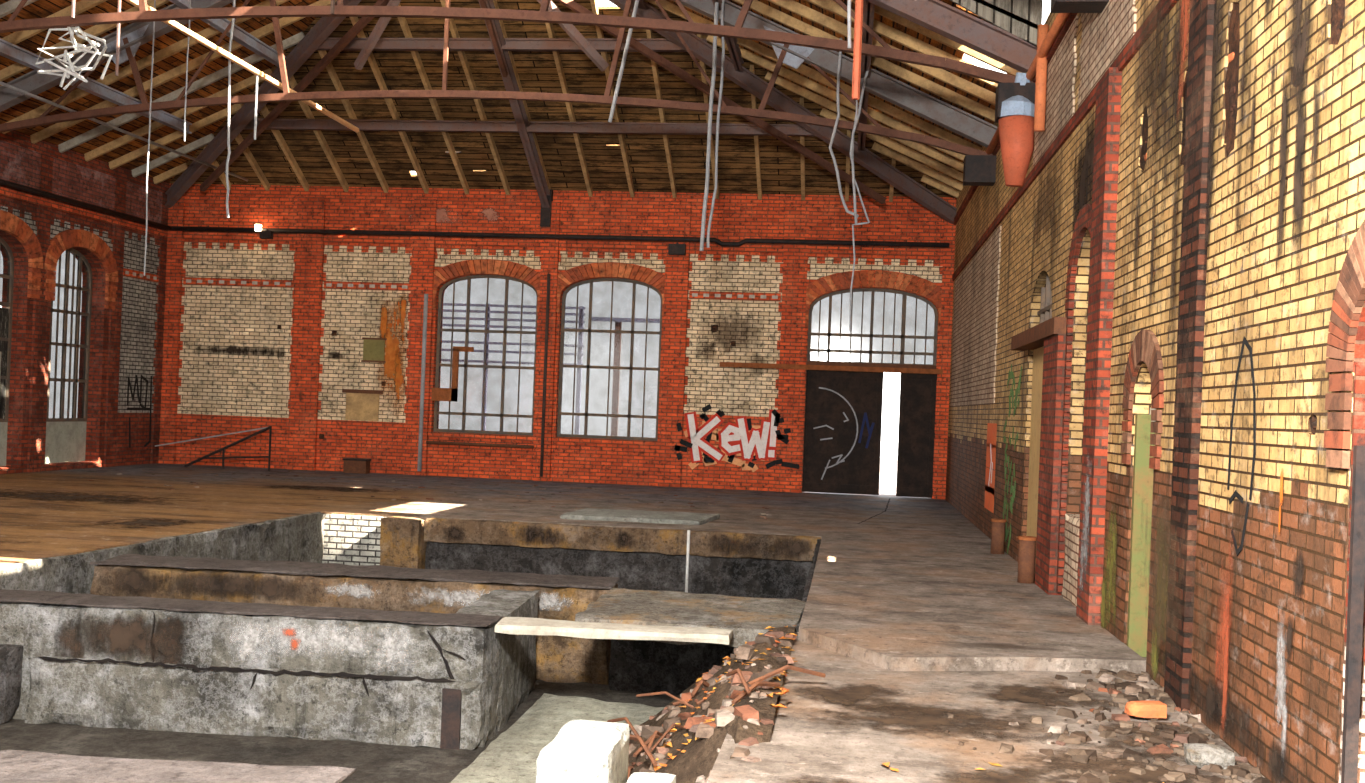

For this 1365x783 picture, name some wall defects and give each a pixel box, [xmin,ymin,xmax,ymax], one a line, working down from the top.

damp [1132,0,1160,312]
damp [1203,123,1214,273]
damp [1236,16,1320,260]